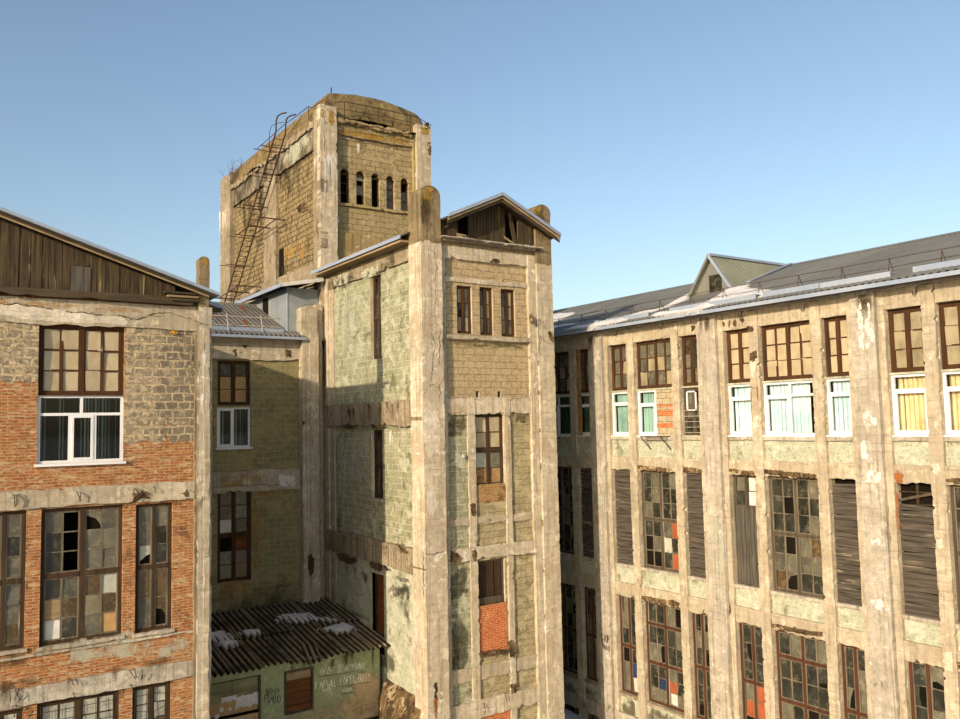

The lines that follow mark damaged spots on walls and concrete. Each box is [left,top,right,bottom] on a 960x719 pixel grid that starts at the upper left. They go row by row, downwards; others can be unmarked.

crack [0,302,209,325]
spalling [931,463,960,484]
spalling [123,486,156,508]
damp [450,569,467,600]
damp [452,623,468,670]
spalling [943,651,960,671]